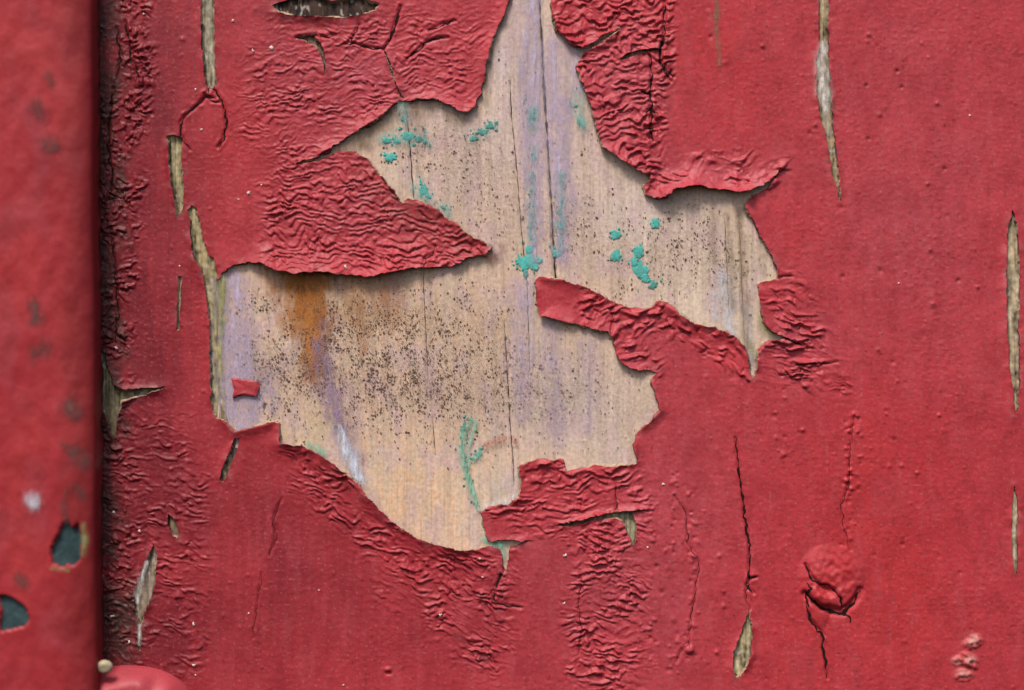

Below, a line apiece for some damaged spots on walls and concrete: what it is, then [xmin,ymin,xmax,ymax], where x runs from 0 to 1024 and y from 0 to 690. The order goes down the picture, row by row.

peeling [816,0,840,199]
rust [282,271,330,381]
peeling [168,0,786,570]
peeling [1006,214,1020,412]
peeling [0,595,30,631]
peeling [52,521,82,567]
peeling [135,547,157,650]
peeling [733,615,752,676]
crack [735,438,757,608]
crack [806,603,828,677]